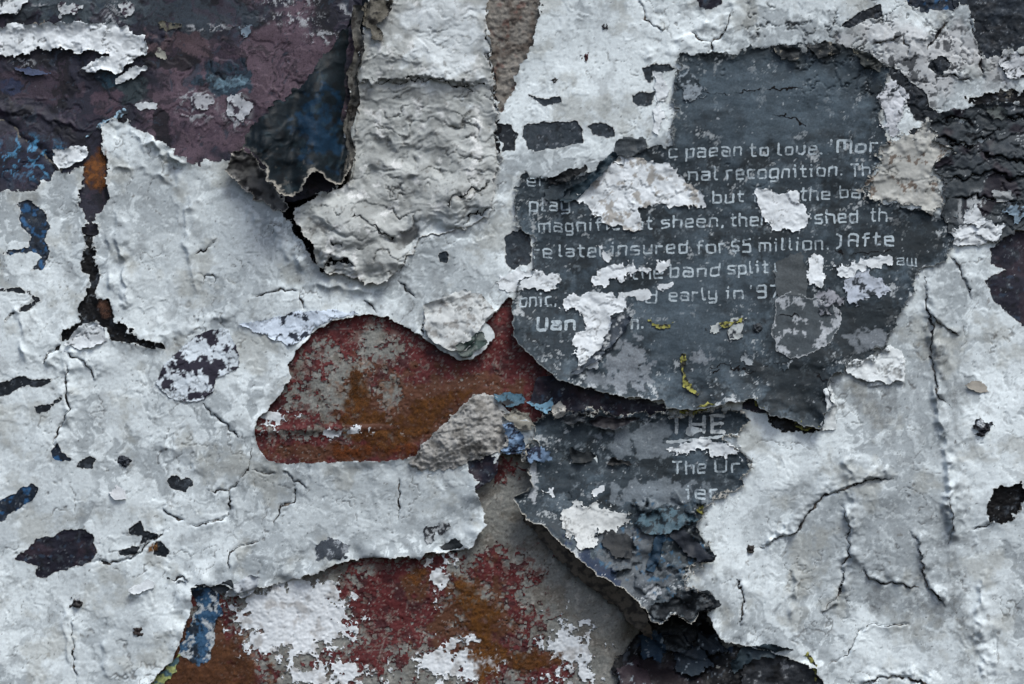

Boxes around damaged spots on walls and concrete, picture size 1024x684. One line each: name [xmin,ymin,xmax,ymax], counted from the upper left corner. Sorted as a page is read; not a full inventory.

spalling [485,0,615,152]
peeling [0,0,368,402]
crack [283,213,356,273]
corrosion [333,366,476,459]
peeling [15,529,97,578]
crack [101,402,306,568]
corrosion [167,643,256,684]
peeling [151,289,837,684]
corrosion [451,572,562,684]
crack [737,579,745,622]
crack [754,478,941,609]
peeling [987,481,1024,524]